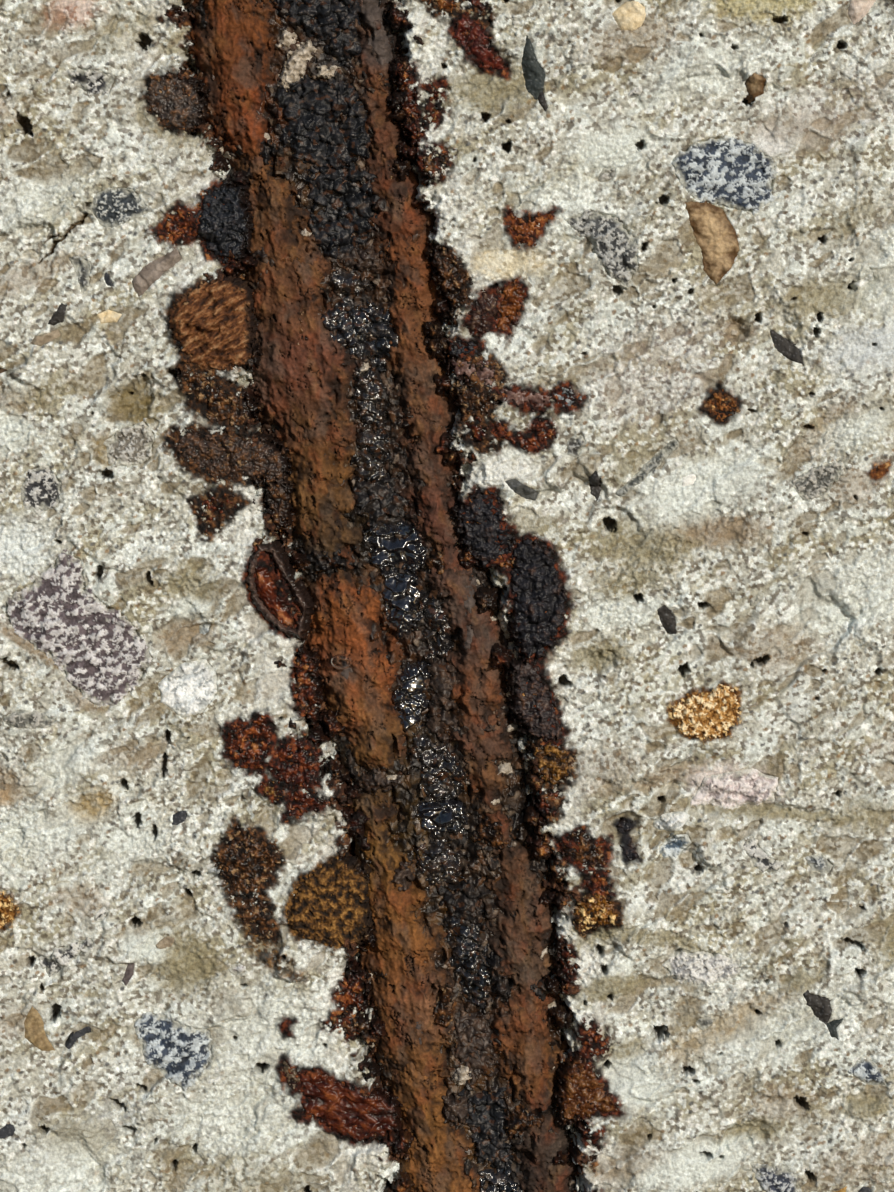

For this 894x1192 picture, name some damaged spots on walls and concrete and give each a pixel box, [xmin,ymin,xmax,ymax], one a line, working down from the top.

rust [140,0,481,1192]
rust [348,0,643,1192]